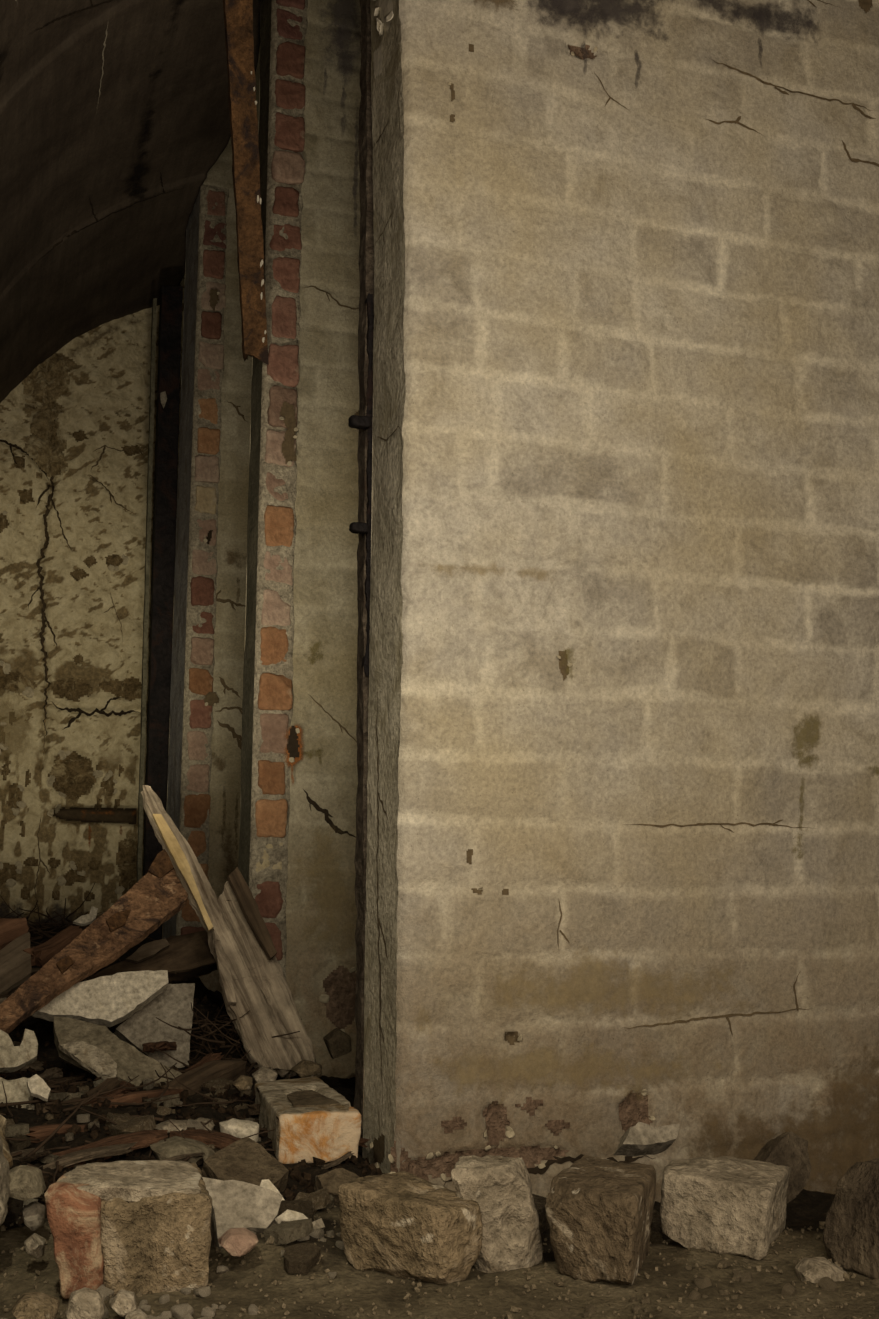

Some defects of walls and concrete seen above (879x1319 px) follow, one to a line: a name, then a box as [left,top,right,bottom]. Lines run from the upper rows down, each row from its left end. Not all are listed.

water stain [539,0,666,40]
water stain [700,0,817,54]
crack [706,57,876,119]
crack [0,429,144,762]
spalling [70,554,128,581]
spalling [0,654,142,702]
crack [624,820,817,832]
spalling [0,835,138,901]
crack [302,685,388,1100]
crack [622,971,811,1036]
spalling [369,1097,570,1181]
spalling [619,1089,655,1132]